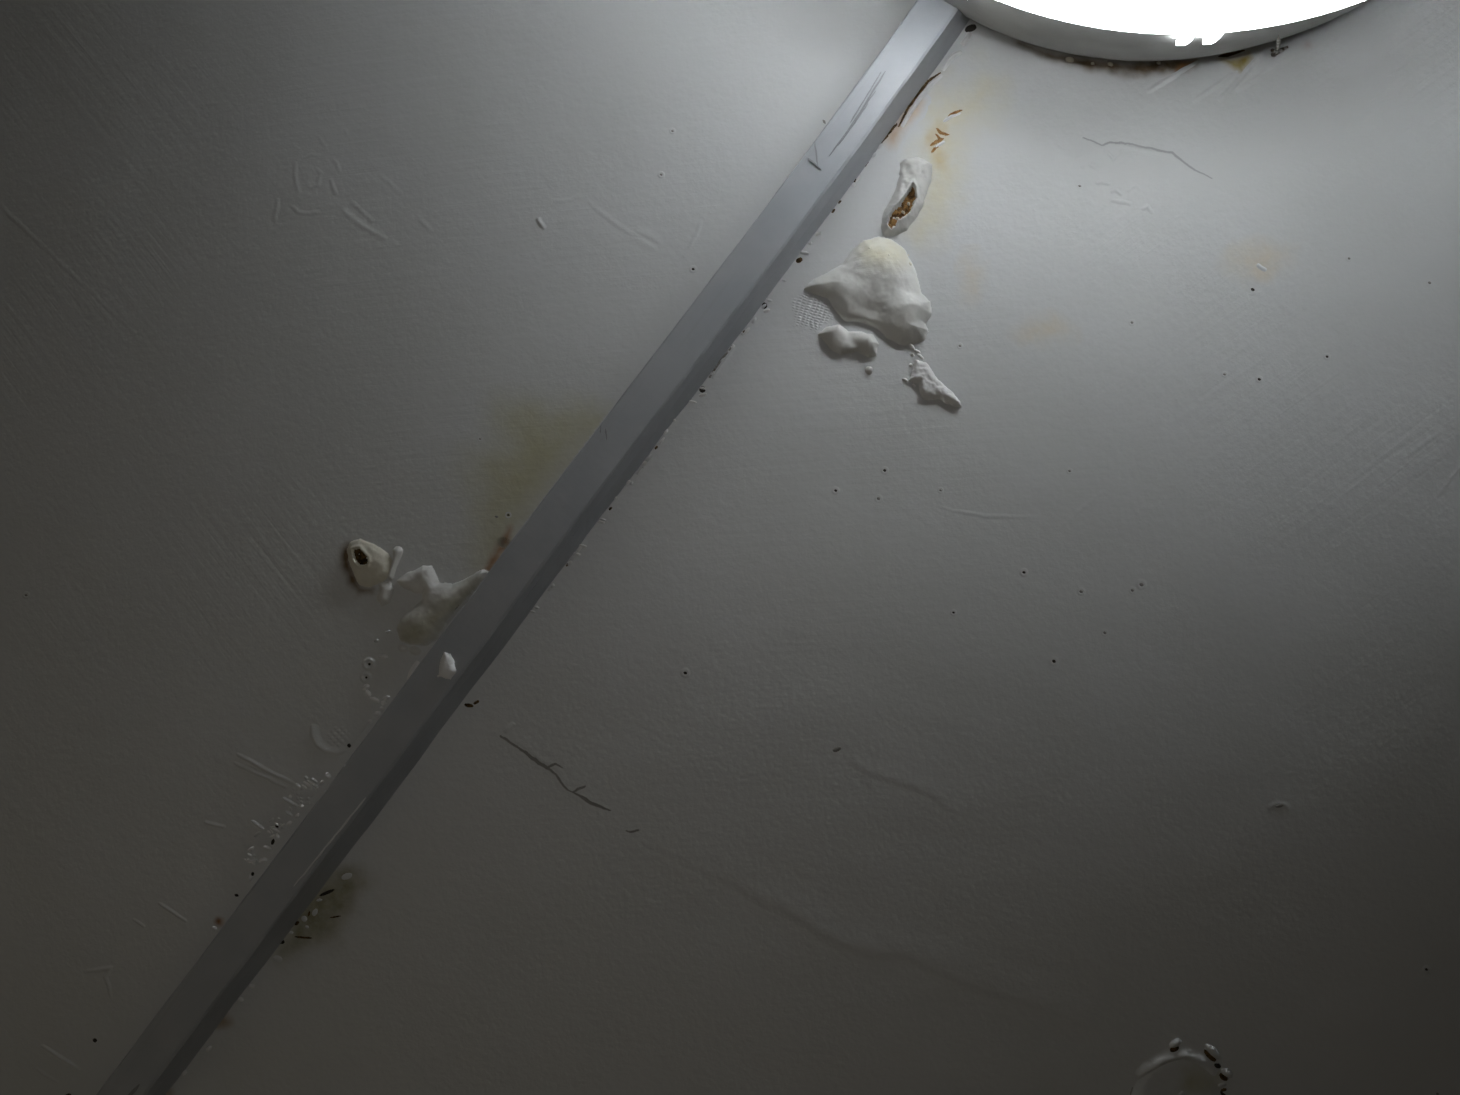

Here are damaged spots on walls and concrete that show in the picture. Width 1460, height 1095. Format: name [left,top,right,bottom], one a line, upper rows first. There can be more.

crack [1052,137,1212,215]
crack [500,721,639,833]